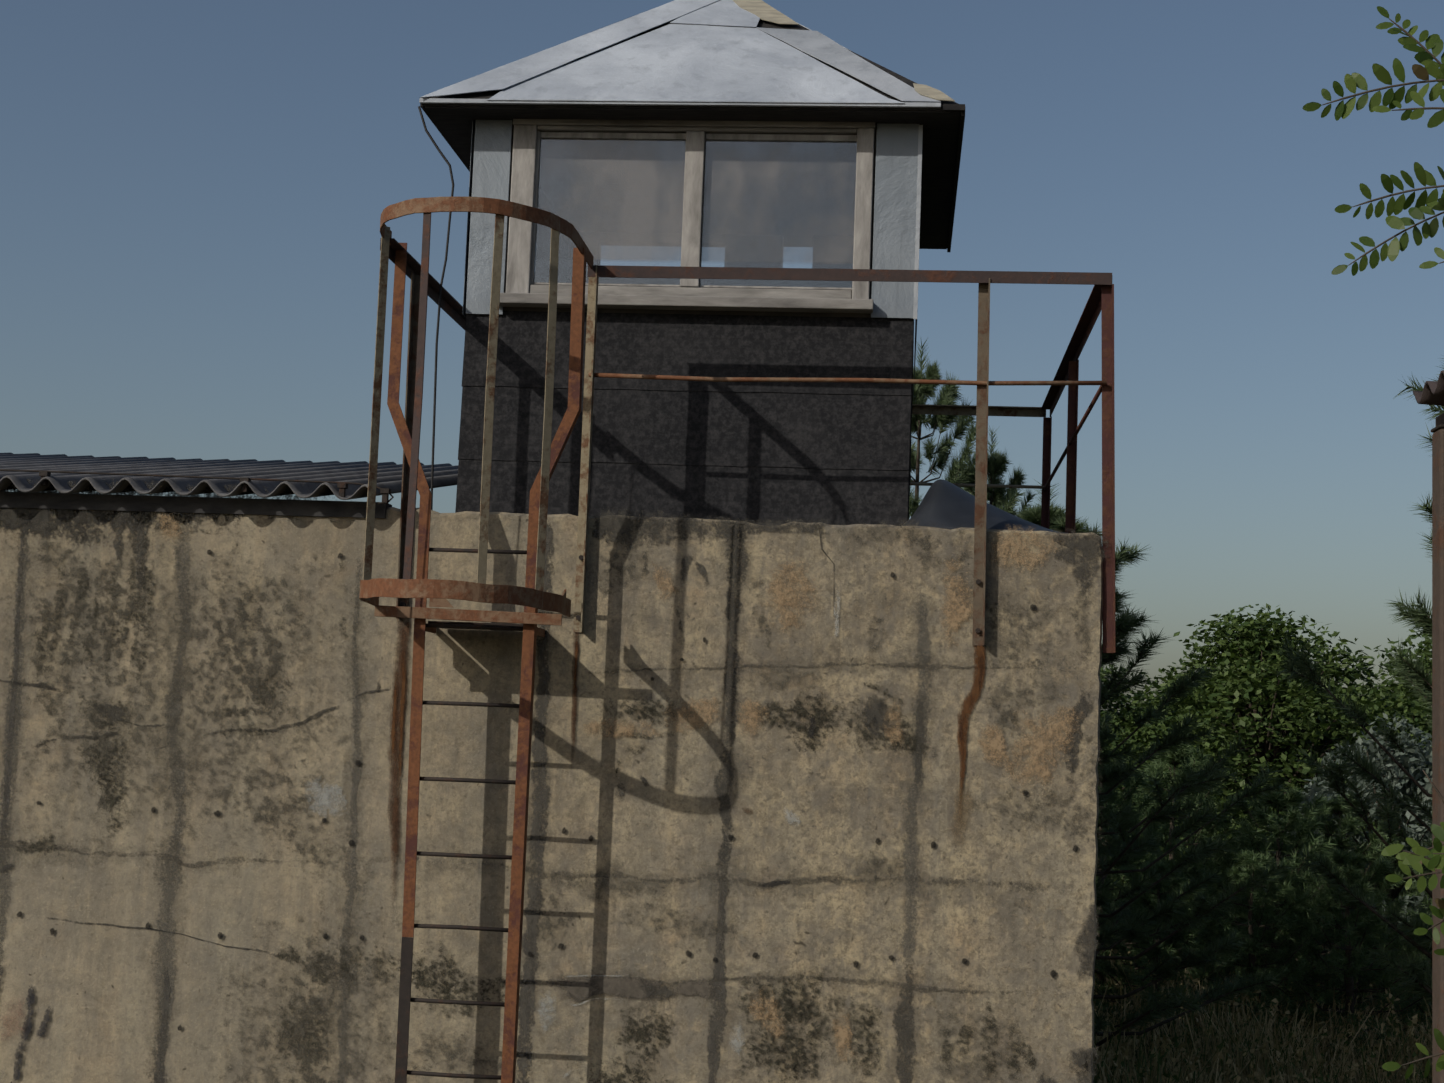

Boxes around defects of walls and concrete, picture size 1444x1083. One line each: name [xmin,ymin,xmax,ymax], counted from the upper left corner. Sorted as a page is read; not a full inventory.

leakage [0,479,317,750]
crack [0,680,160,747]
leakage [77,700,133,828]
crack [213,686,388,734]
corrosion [388,621,409,873]
leakage [757,673,935,753]
crack [49,918,261,952]
leakage [276,947,395,1081]
leakage [412,947,521,1018]
leakage [599,1005,674,1083]
leakage [740,973,881,1083]